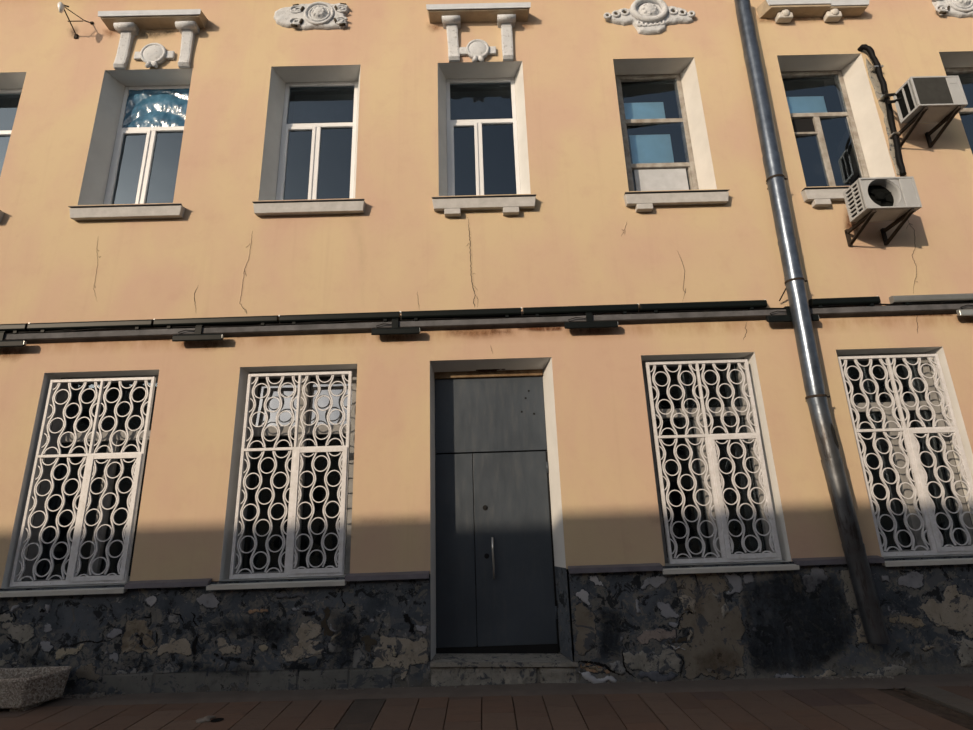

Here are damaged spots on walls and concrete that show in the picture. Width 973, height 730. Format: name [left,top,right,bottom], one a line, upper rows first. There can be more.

crack [92,236,100,301]
crack [238,231,253,314]
crack [468,219,480,307]
crack [907,220,918,334]
flaking render [0,604,85,660]
flaking render [105,618,192,664]
flaking render [216,636,242,656]
flaking render [257,620,430,681]
flaking render [574,571,757,684]
peeling [789,566,869,646]
peeling [879,570,924,590]
flaking render [888,584,973,639]